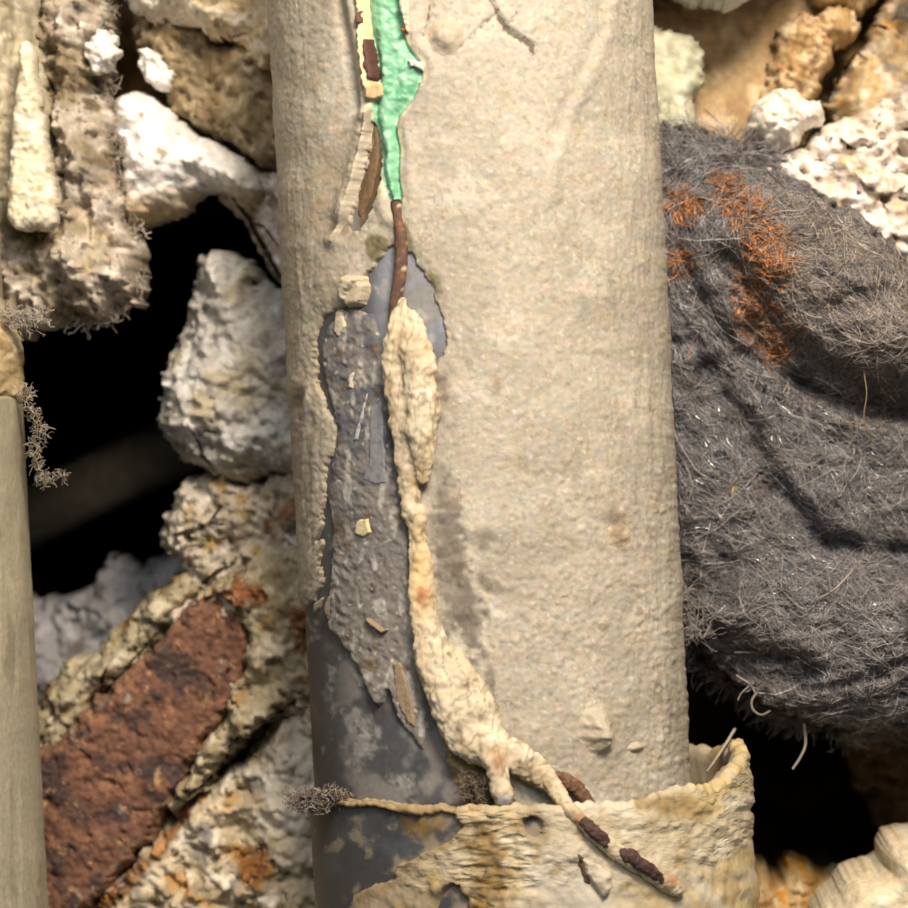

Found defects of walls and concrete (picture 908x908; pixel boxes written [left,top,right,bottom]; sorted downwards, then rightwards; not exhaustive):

crack [481,3,534,53]
peeling [322,274,425,750]